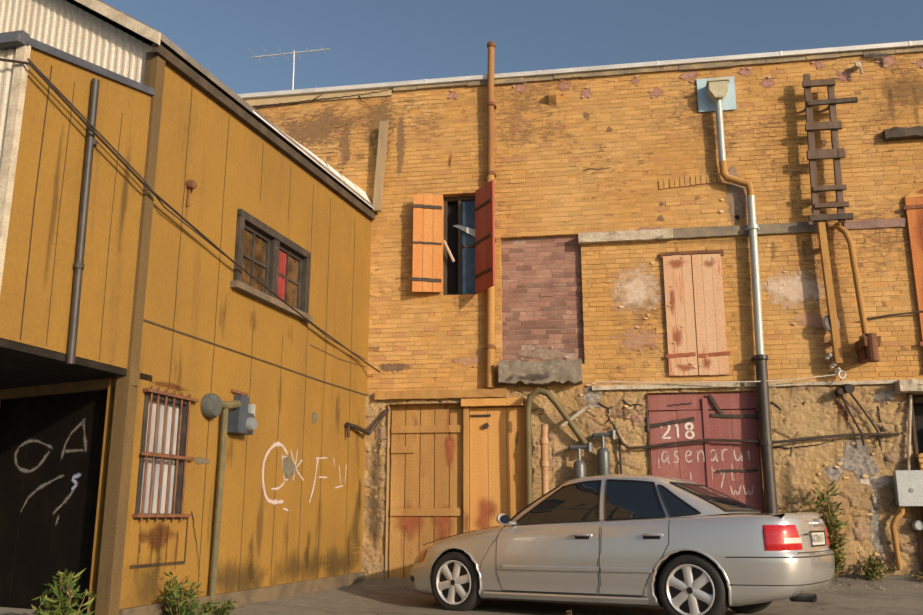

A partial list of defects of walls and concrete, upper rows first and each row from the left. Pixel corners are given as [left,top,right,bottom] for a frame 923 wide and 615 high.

peeling [607,261,667,350]
peeling [764,270,841,328]
damp [857,476,889,507]
corrosion [138,525,179,567]